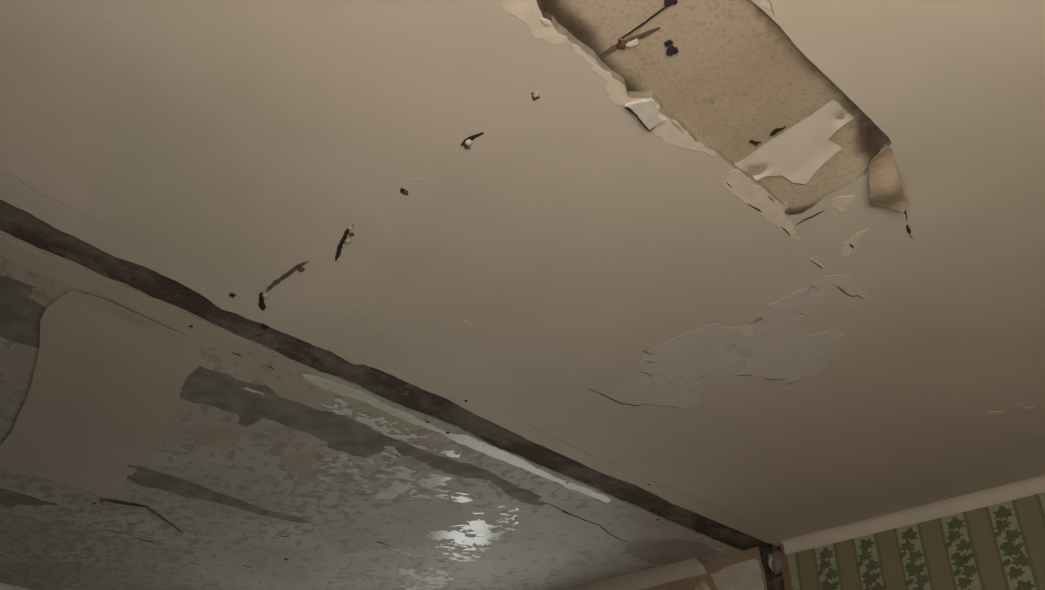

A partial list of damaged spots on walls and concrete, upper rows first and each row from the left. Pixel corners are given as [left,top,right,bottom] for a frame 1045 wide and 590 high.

peeling [755,0,774,13]
peeling [501,0,716,156]
peeling [723,169,855,242]
peeling [626,539,721,566]
flaking render [711,559,764,590]